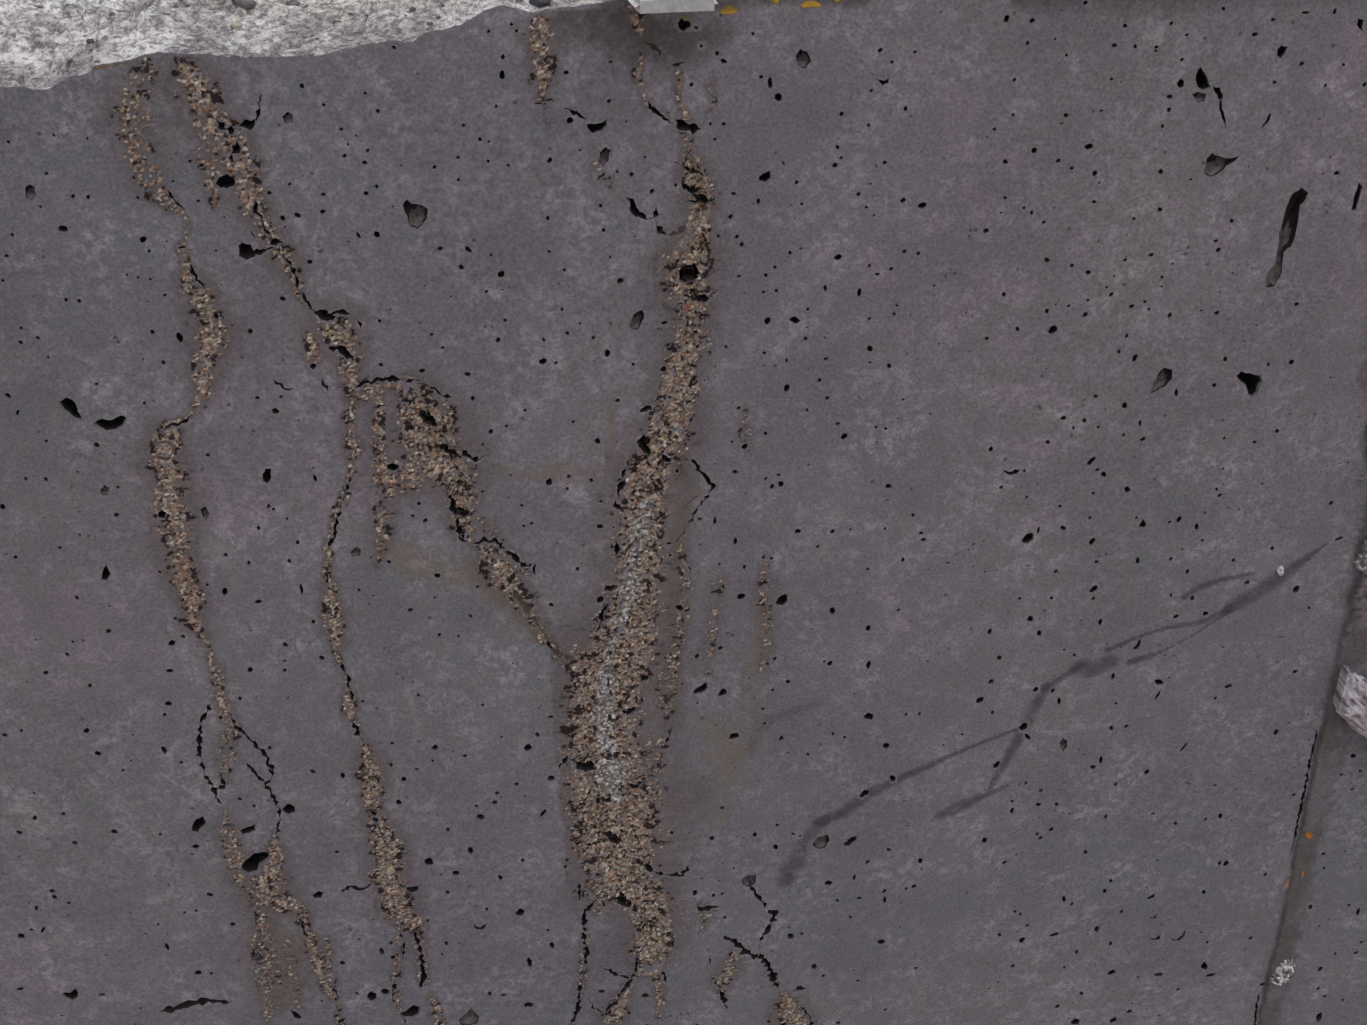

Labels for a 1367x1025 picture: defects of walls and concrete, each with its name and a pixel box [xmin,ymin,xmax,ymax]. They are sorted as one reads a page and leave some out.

crack [1291,730,1317,851]
crack [162,998,232,1013]
crack [1253,993,1261,1025]